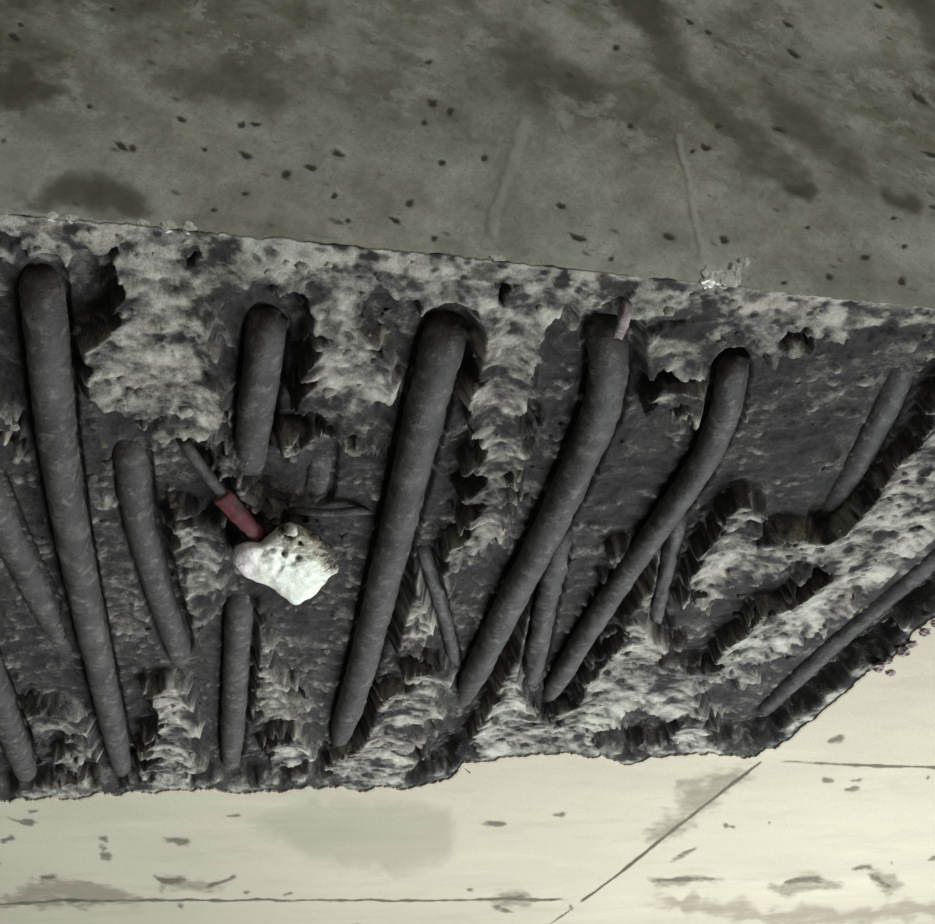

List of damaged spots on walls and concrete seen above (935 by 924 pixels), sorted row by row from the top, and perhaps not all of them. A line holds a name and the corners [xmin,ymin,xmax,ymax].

leakage [614,0,679,72]
leakage [44,175,145,216]
spalling [0,214,935,801]
crack [816,762,935,770]
crack [0,763,761,924]